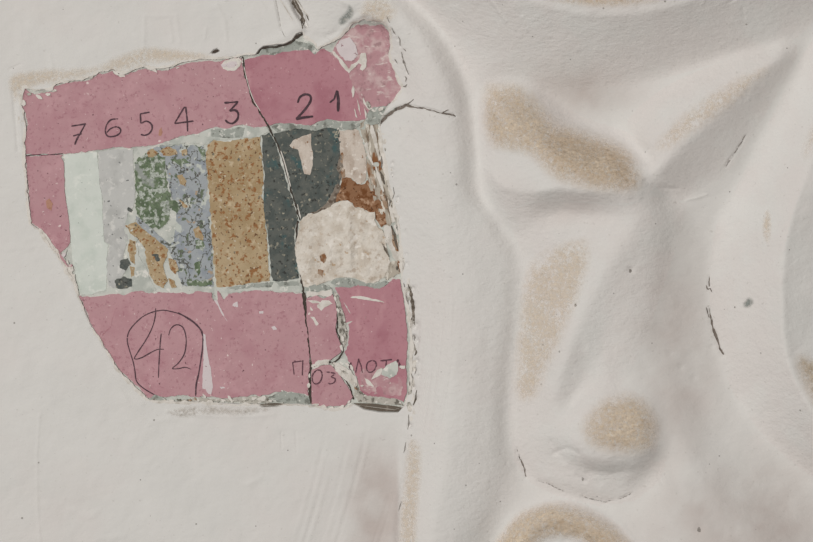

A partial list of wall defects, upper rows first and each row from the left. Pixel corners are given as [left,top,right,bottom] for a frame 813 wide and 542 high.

crack [242,0,309,242]
crack [381,17,456,124]
peeling [18,17,417,430]
crack [300,275,354,404]
crack [706,276,724,355]